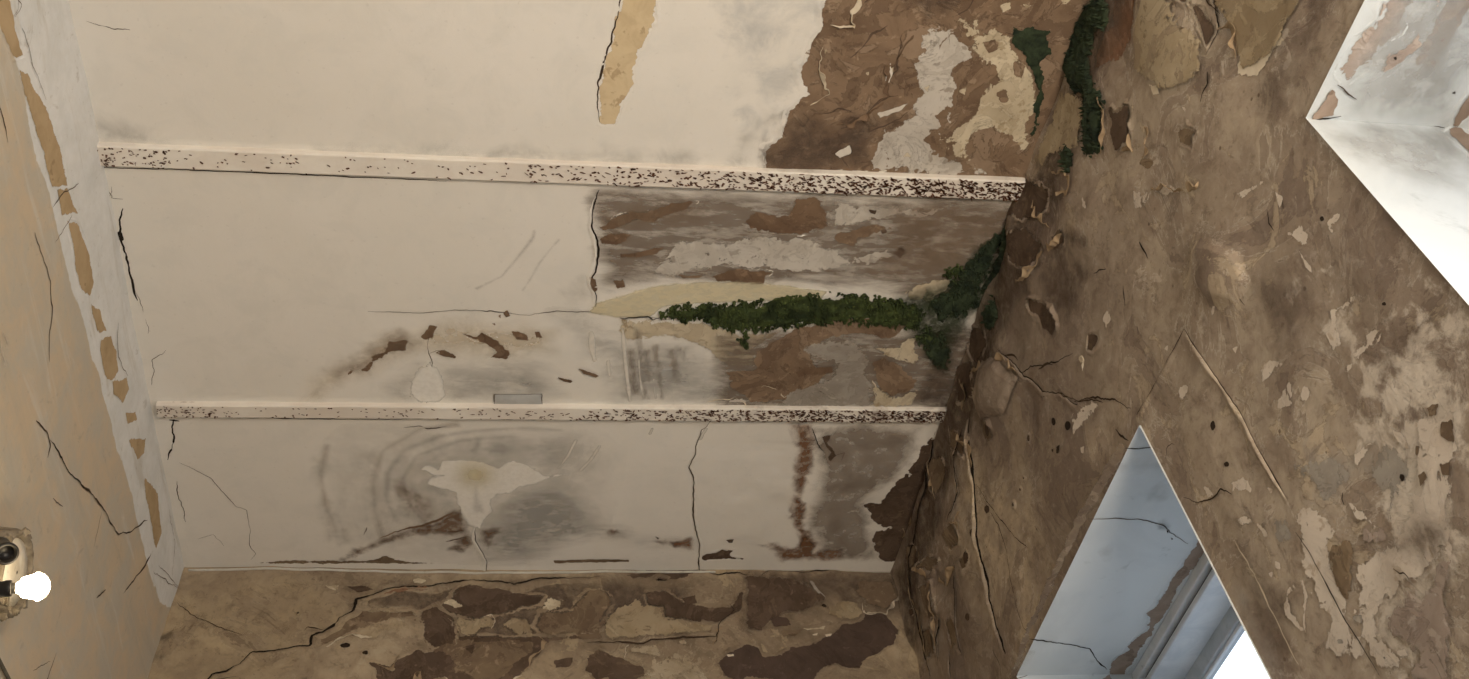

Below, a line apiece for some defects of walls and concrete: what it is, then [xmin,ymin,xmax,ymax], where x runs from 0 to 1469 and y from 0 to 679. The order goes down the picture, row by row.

peeling [0,0,146,459]
peeling [745,0,1153,343]
peeling [1313,0,1469,120]
crack [207,528,600,679]
leakage [355,460,571,553]
flaking render [291,417,995,679]
crack [689,422,873,580]
peeling [718,318,906,403]
leakage [589,147,1061,642]
crack [964,420,1106,679]
crack [997,349,1174,454]
flaking render [1284,404,1457,669]